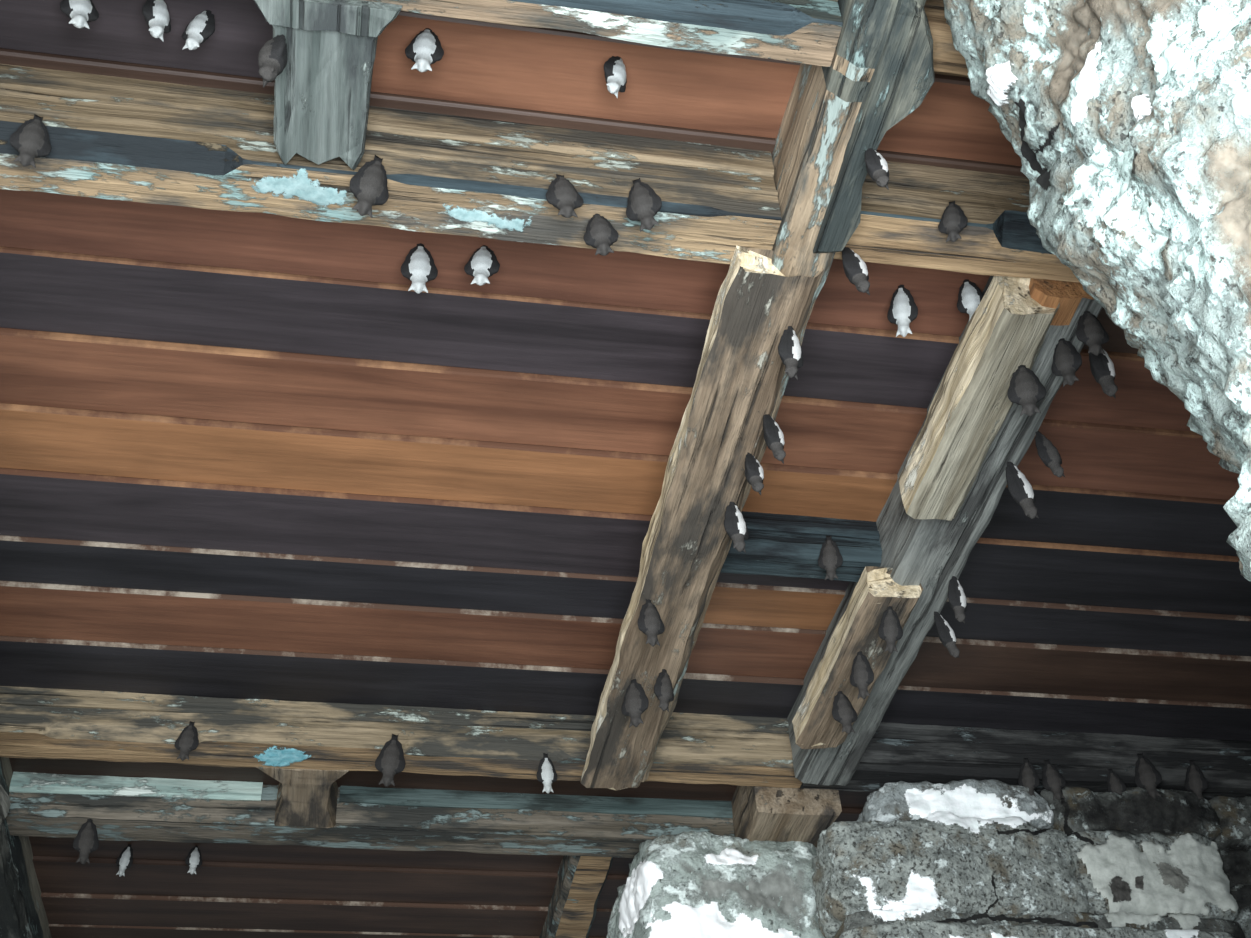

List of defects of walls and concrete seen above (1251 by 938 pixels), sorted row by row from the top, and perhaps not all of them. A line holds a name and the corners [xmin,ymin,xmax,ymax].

peeling [247,168,351,207]
peeling [443,204,532,232]